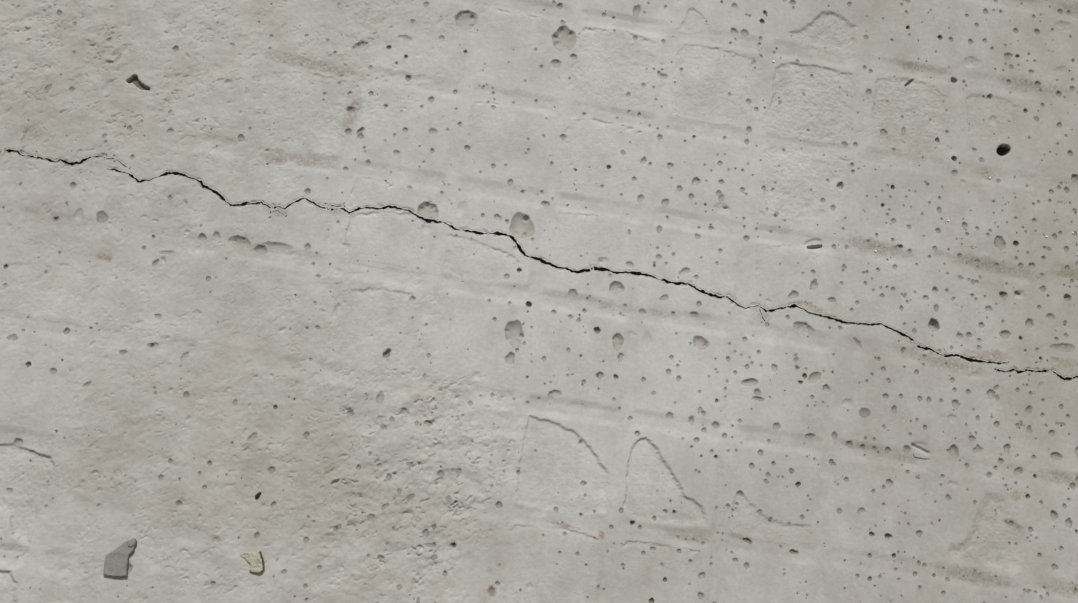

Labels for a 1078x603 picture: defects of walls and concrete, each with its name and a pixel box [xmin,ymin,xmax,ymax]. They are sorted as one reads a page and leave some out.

crack [0,148,1078,382]